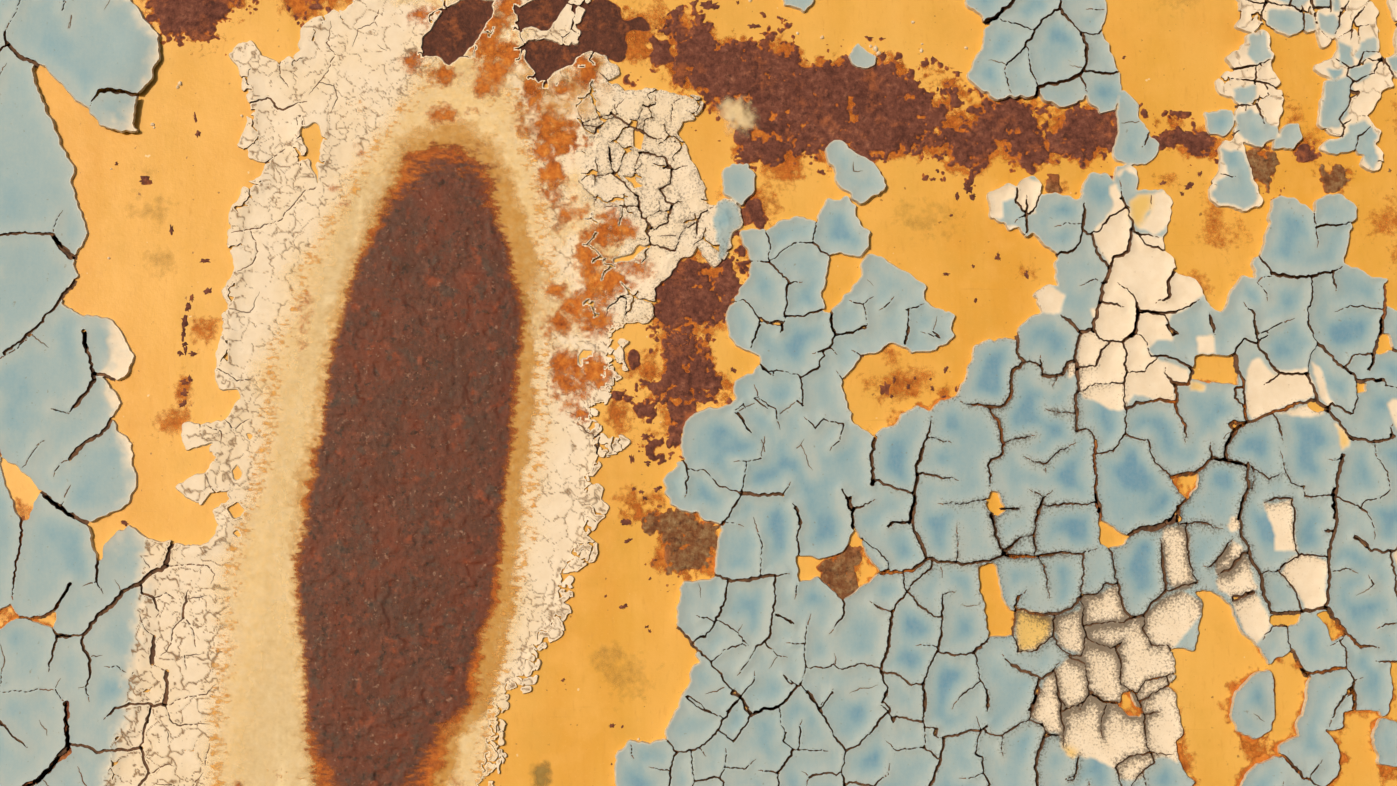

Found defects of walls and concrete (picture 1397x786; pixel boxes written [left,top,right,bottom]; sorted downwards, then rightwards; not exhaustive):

corrosion [160,374,193,430]
corrosion [177,287,216,356]
corrosion [145,0,259,56]
crack [0,0,433,786]
peeling [0,0,502,786]
crack [504,296,648,700]
crack [511,68,713,297]
corrosion [209,0,1118,786]
peeling [465,0,1397,786]
crack [631,182,1397,786]
corrosion [1139,103,1221,196]
corrosion [1220,621,1397,786]